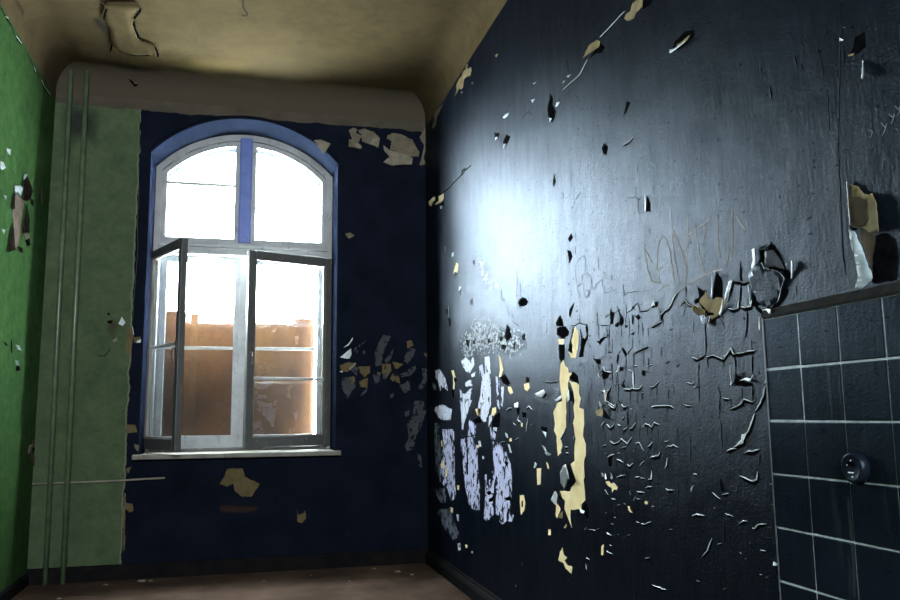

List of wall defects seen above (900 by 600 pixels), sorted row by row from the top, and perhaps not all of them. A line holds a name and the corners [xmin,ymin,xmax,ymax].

peeling [624,0,653,21]
peeling [455,64,473,95]
peeling [547,60,571,122]
peeling [349,105,443,166]
peeling [2,174,43,253]
peeling [847,184,897,289]
crack [724,261,750,304]
peeling [680,242,799,337]
peeling [340,254,668,555]
peeling [730,371,753,387]
peeling [219,468,260,497]
peeling [558,548,572,581]